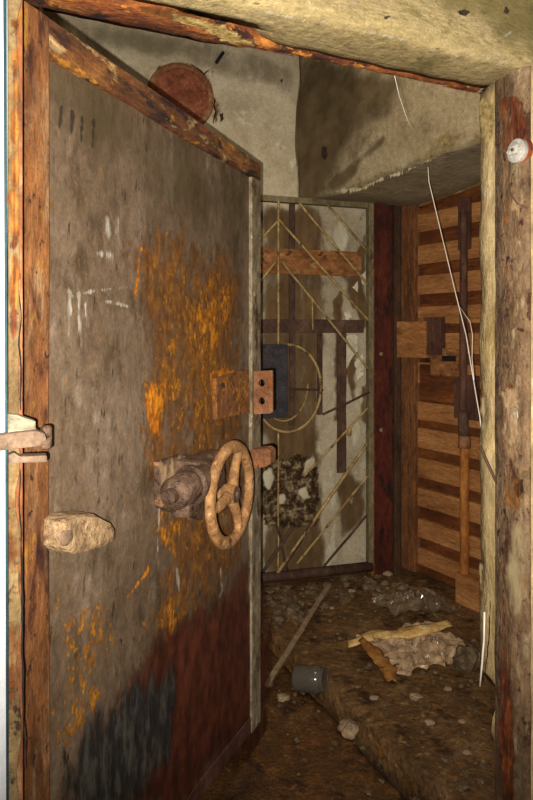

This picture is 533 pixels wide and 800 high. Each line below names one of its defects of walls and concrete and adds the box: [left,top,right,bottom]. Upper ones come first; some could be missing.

water stain [263,59,411,250]
corrosion [501,96,527,151]
water stain [265,274,322,320]
water stain [333,237,366,327]
corrosion [125,225,248,480]
water stain [334,333,366,423]
corrosion [225,453,242,507]
water stain [261,333,324,572]
water stain [336,474,364,533]
corrosion [142,506,242,646]
corrosion [57,601,114,746]